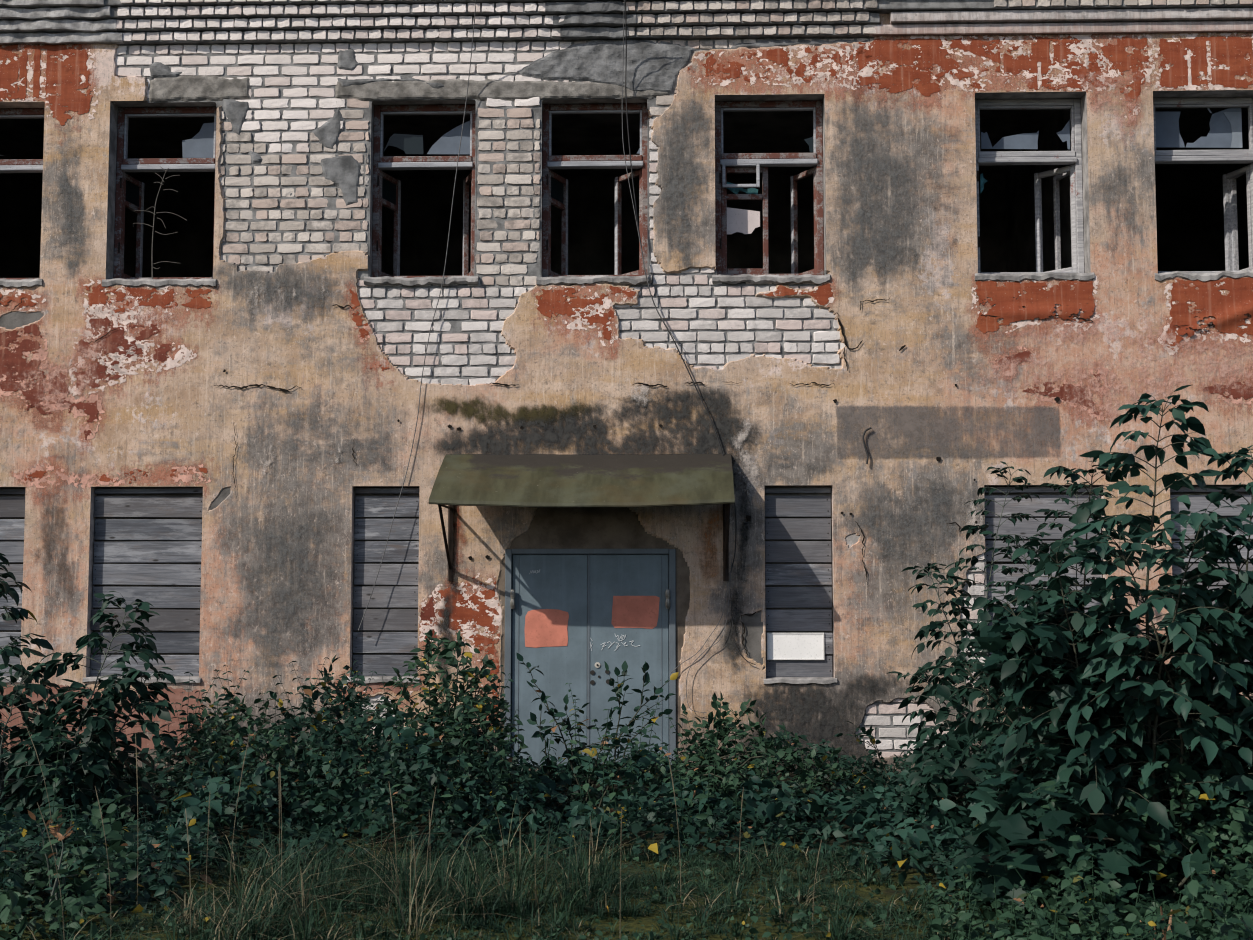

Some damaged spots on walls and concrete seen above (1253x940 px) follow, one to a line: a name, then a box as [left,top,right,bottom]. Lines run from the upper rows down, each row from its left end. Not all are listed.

peeling [0,44,101,128]
flaking render [115,0,1253,387]
peeling [0,278,219,447]
water stain [435,385,759,667]
water stain [436,580,459,685]
flaking render [418,507,690,759]
flaking render [855,698,958,758]